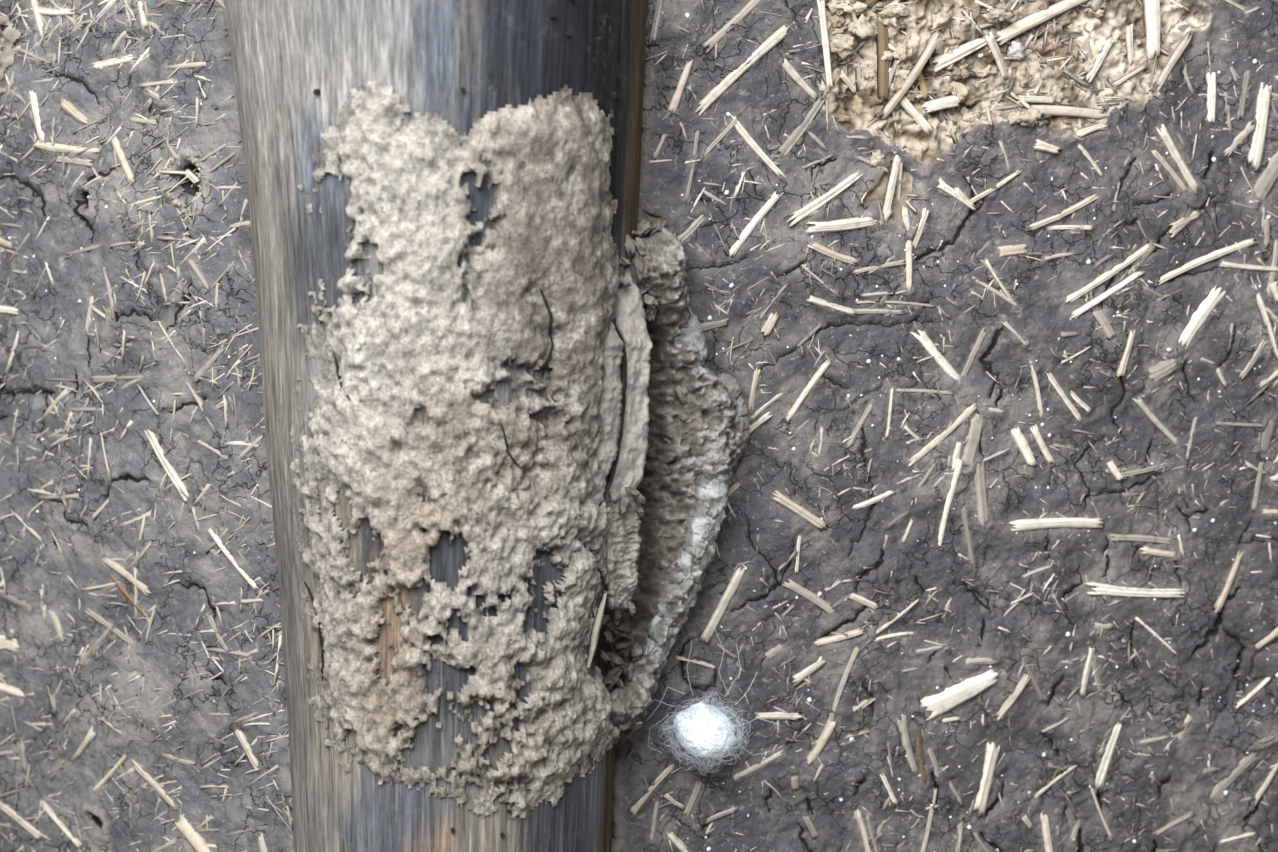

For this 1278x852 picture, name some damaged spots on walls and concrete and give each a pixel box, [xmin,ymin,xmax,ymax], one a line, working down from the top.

spalling [817,0,1213,236]
crack [916,175,984,260]
crack [1118,152,1219,308]
crack [761,319,934,369]
crack [977,326,1004,458]
crack [1074,366,1156,509]
crack [732,512,794,612]
crack [822,428,885,637]
crack [679,639,717,691]
crack [1193,588,1245,694]
crack [980,780,1004,852]
crack [1063,788,1102,852]